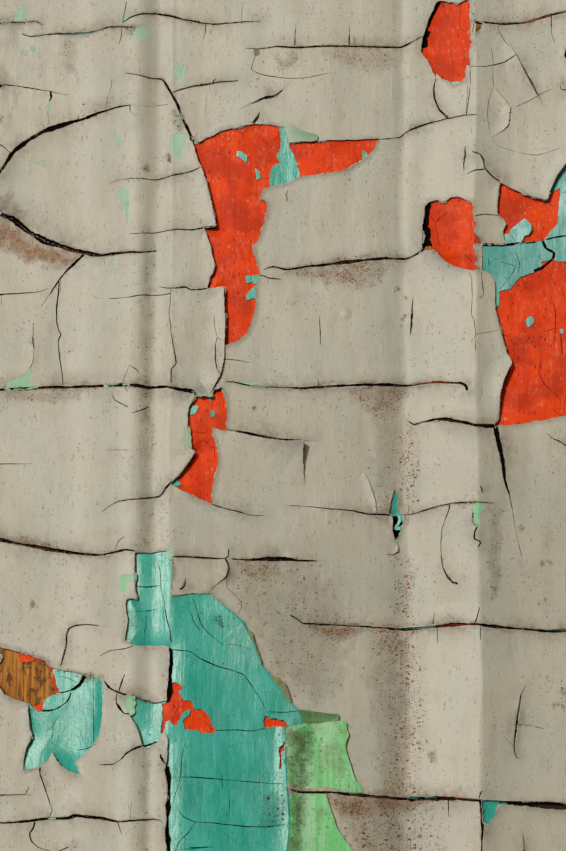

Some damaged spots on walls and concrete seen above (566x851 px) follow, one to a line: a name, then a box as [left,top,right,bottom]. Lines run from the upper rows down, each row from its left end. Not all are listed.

crack [0,28,424,173]
peeling [421,0,483,84]
corrosion [0,213,75,269]
crack [0,212,216,413]
peeling [170,120,379,351]
peeling [420,165,566,428]
peeling [172,387,227,504]
crack [409,417,522,556]
peeling [0,647,103,774]
peeling [113,544,363,851]
crack [0,624,484,851]
crack [290,607,566,644]